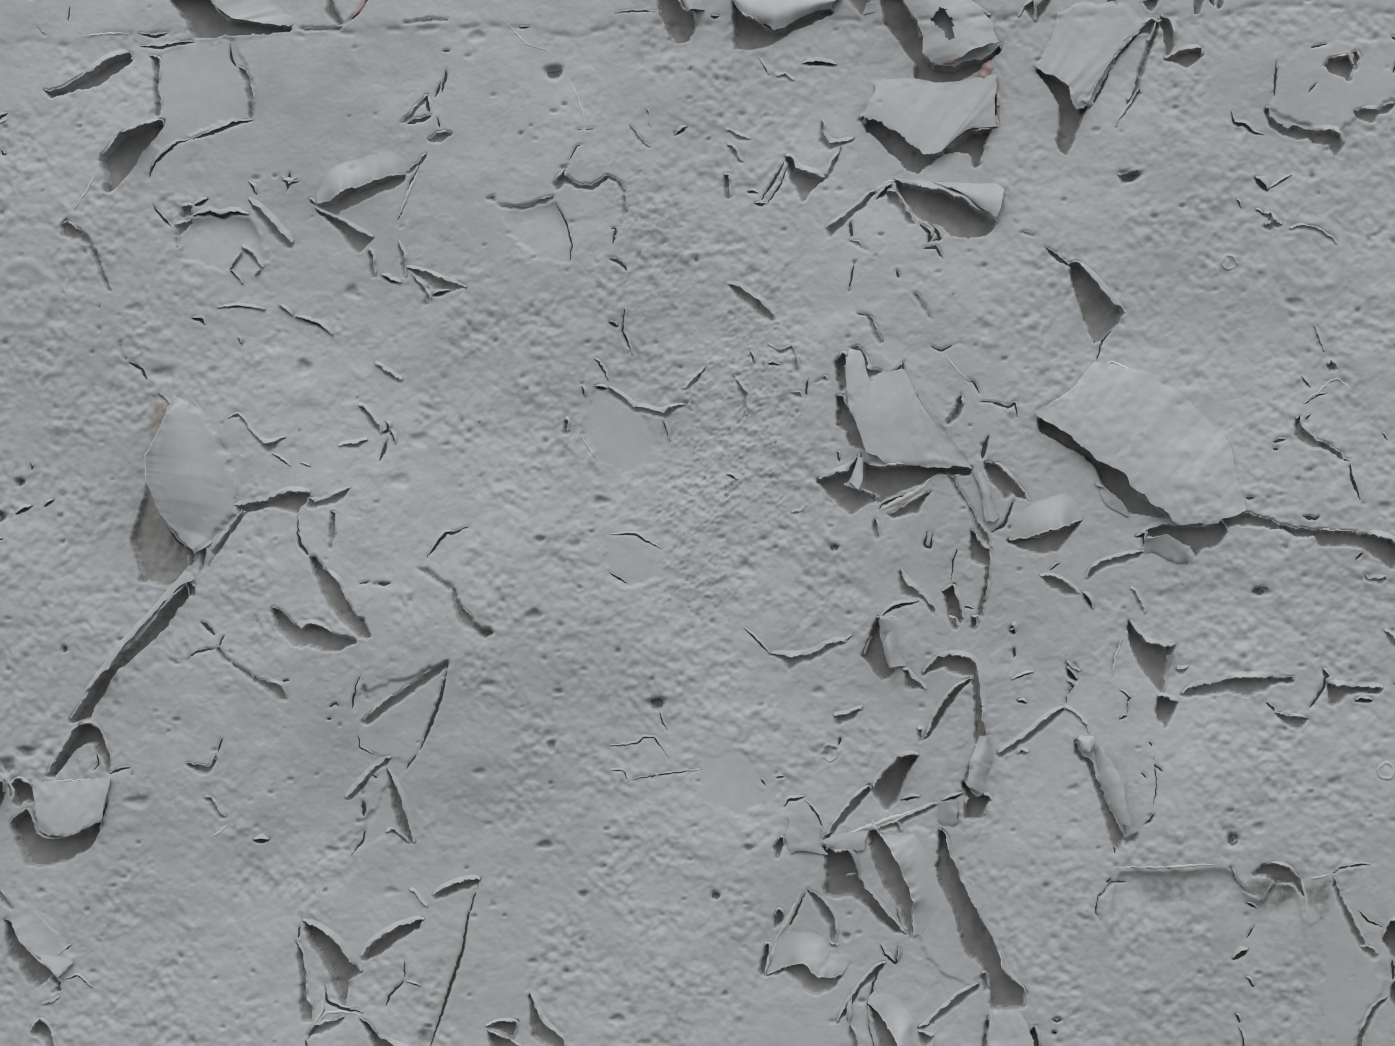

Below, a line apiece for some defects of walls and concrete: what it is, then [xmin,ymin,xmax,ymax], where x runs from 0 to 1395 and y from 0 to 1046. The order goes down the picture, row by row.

peeling [210,0,368,29]
peeling [732,0,836,32]
peeling [860,0,1002,163]
peeling [1034,0,1204,109]
peeling [151,181,294,247]
peeling [309,70,467,300]
peeling [826,177,1004,291]
peeling [1035,331,1395,608]
peeling [0,391,390,839]
crack [177,621,290,699]
peeling [744,345,1309,1046]
peeling [296,874,481,1046]